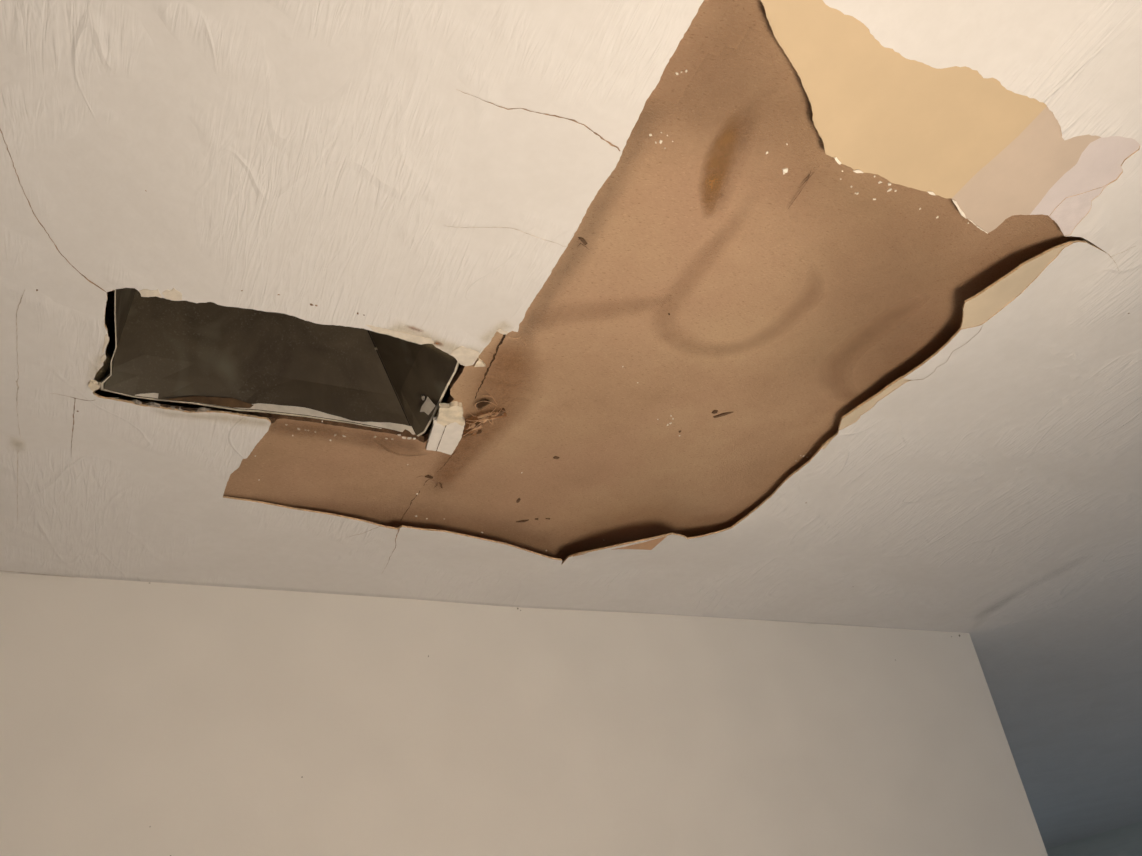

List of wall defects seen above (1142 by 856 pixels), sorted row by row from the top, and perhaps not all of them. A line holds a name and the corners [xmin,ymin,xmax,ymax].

crack [456,89,620,151]
crack [0,129,106,292]
flaking render [100,0,1140,562]